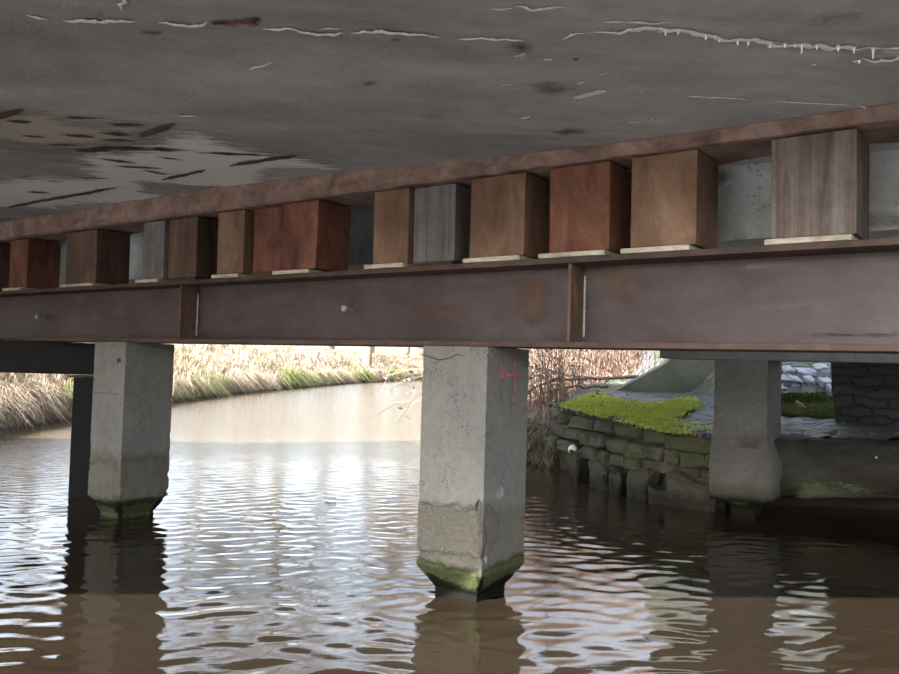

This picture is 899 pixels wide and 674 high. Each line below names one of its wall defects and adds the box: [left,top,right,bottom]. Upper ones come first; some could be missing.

crack [27,0,135,24]
crack [493,5,563,13]
crack [160,21,207,29]
crack [264,27,436,38]
crack [460,35,524,43]
crack [563,21,899,66]
water stain [88,456,163,502]